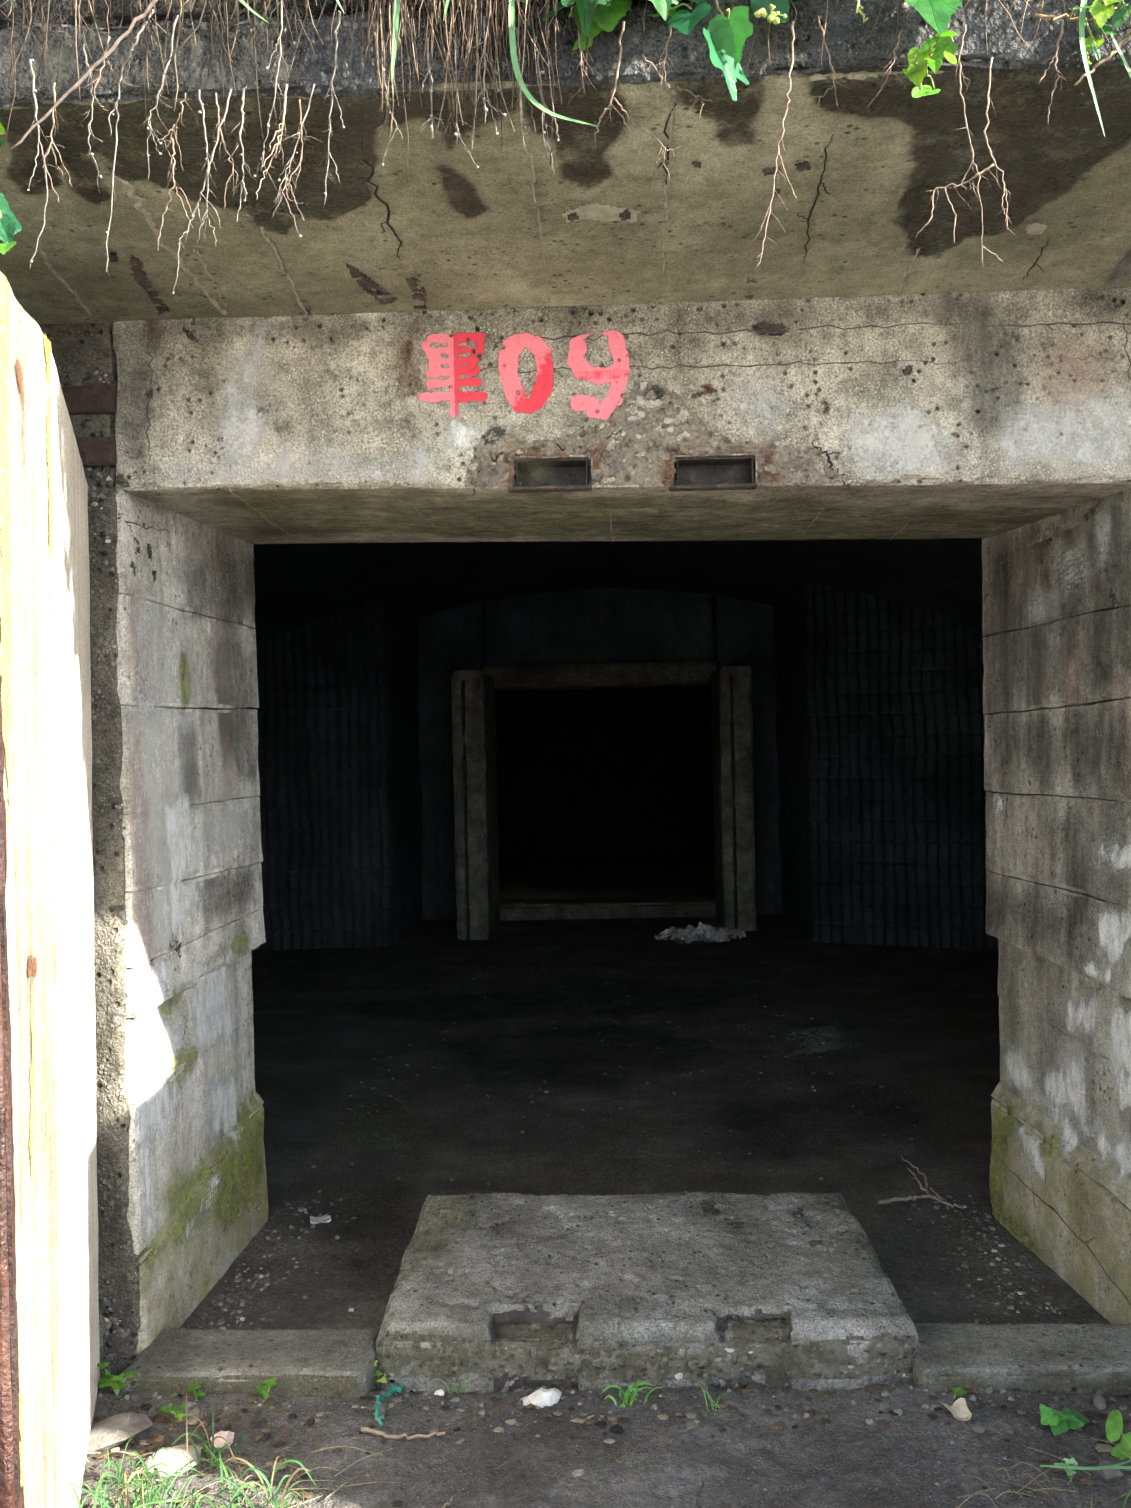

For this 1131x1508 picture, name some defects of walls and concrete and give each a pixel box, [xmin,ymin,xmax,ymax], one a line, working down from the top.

water stain [0,0,626,234]
crack [364,162,402,260]
crack [797,134,833,264]
water stain [805,60,1131,258]
corrosion [16,360,25,409]
water stain [164,794,199,934]
efflorescence [1101,844,1131,869]
corrosion [28,955,38,977]
efflorescence [1067,913,1131,1109]
water stain [132,954,241,1237]
efflorescence [1006,1050,1131,1179]